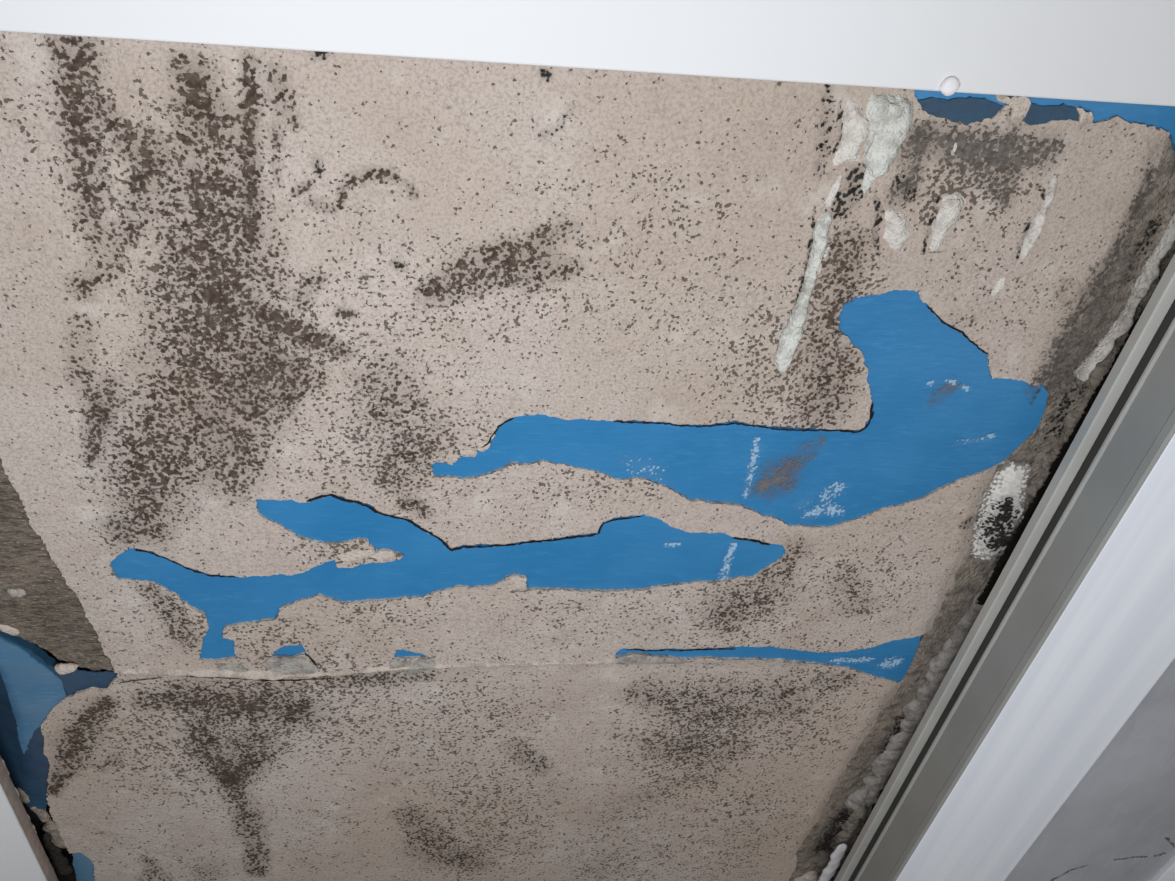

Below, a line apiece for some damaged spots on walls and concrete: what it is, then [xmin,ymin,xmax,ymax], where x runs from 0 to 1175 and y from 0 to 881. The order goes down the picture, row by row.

leakage [887,120,1066,211]
peeling [914,90,1175,154]
leakage [41,35,451,555]
leakage [414,218,584,308]
peeling [431,290,1048,526]
spalling [0,458,117,881]
leakage [45,696,120,798]
leakage [132,671,435,877]
peeling [110,494,786,676]
leakage [695,539,812,635]
peeling [615,636,921,682]
leakage [789,137,1175,881]